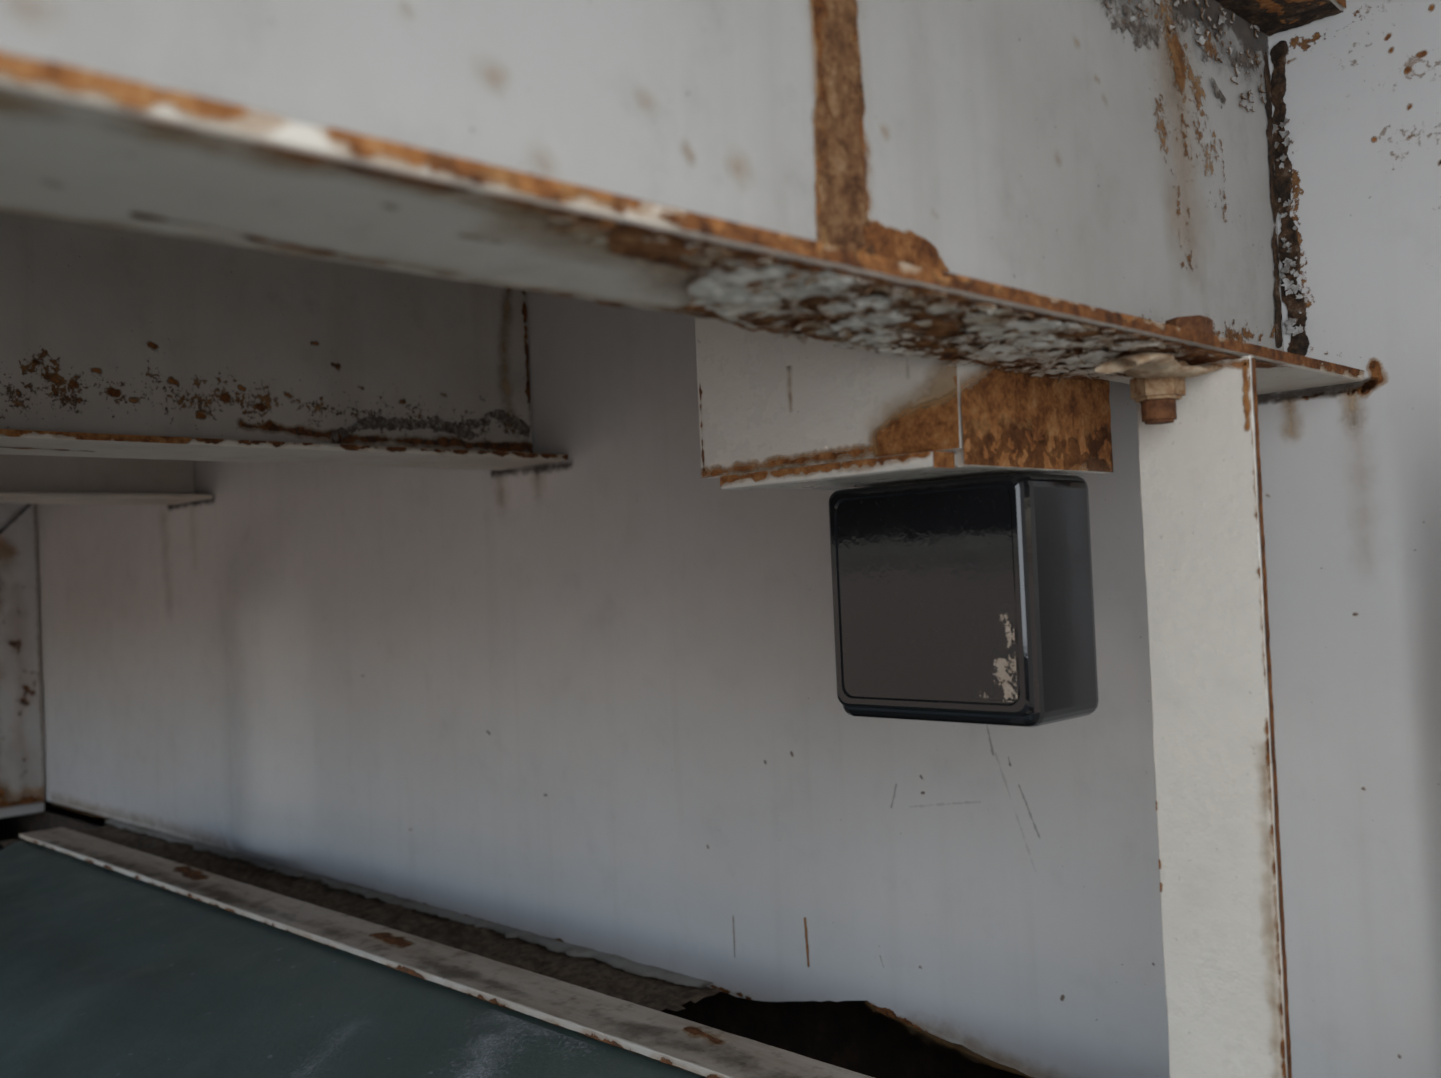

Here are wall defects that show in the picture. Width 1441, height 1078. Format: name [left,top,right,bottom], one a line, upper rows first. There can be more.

corrosion [0,51,260,149]
corrosion [0,286,574,476]
peeling [642,236,1185,383]
corrosion [242,0,1386,1078]
corrosion [8,639,39,716]
corrosion [0,758,99,818]